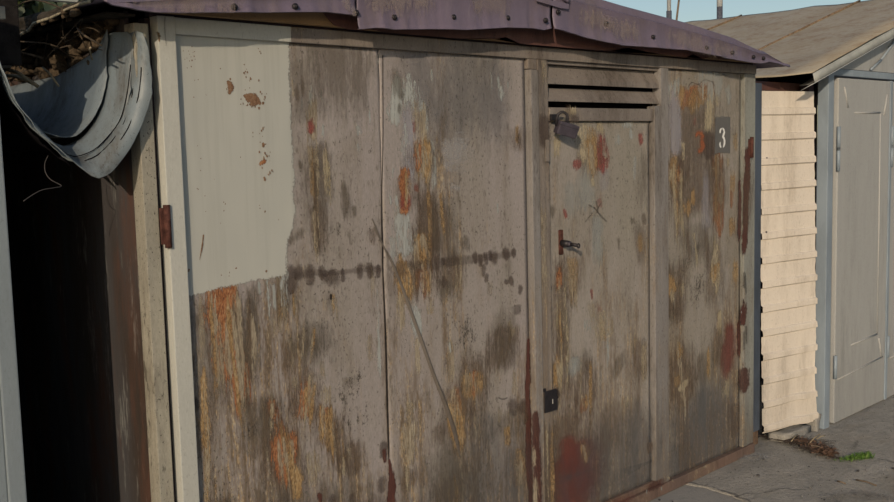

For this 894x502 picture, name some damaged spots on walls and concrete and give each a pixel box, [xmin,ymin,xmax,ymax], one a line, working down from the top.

rust [240,64,267,109]
rust [199,284,258,502]
rust [395,102,445,332]
rust [473,248,515,266]
rust [504,339,533,502]
rust [552,258,596,418]
rust [668,78,751,293]
rust [717,301,750,399]